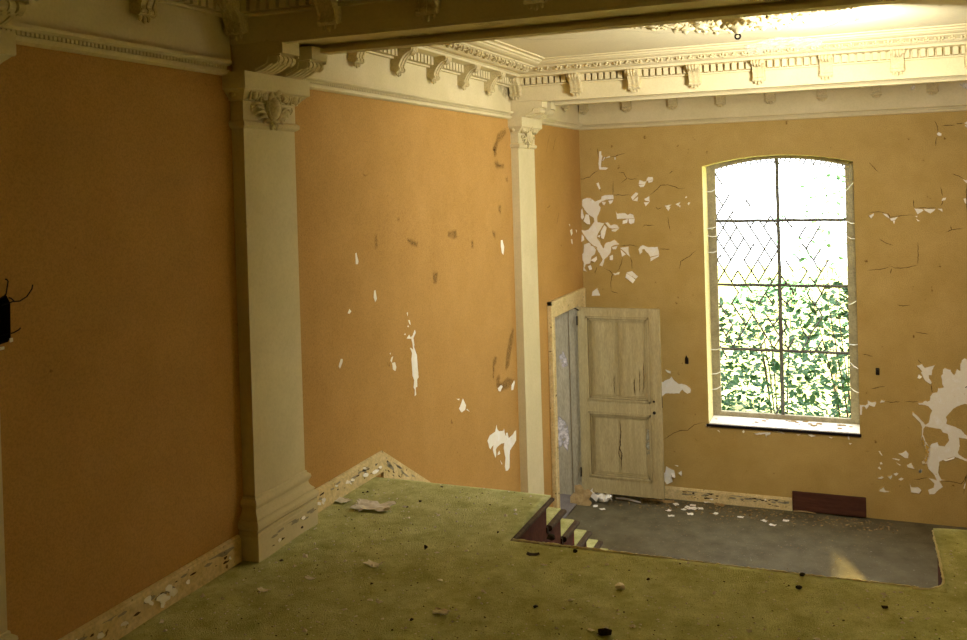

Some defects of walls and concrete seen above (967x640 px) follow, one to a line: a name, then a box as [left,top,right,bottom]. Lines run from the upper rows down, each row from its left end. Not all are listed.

peeling [598,151,616,170]
peeling [569,183,660,283]
crack [584,149,694,268]
peeling [631,176,654,206]
crack [868,174,967,217]
peeling [914,198,946,221]
peeling [404,312,419,395]
peeling [488,425,516,471]
peeling [662,369,692,402]
peeling [876,358,967,495]
peeling [272,458,415,546]
peeling [76,547,234,640]